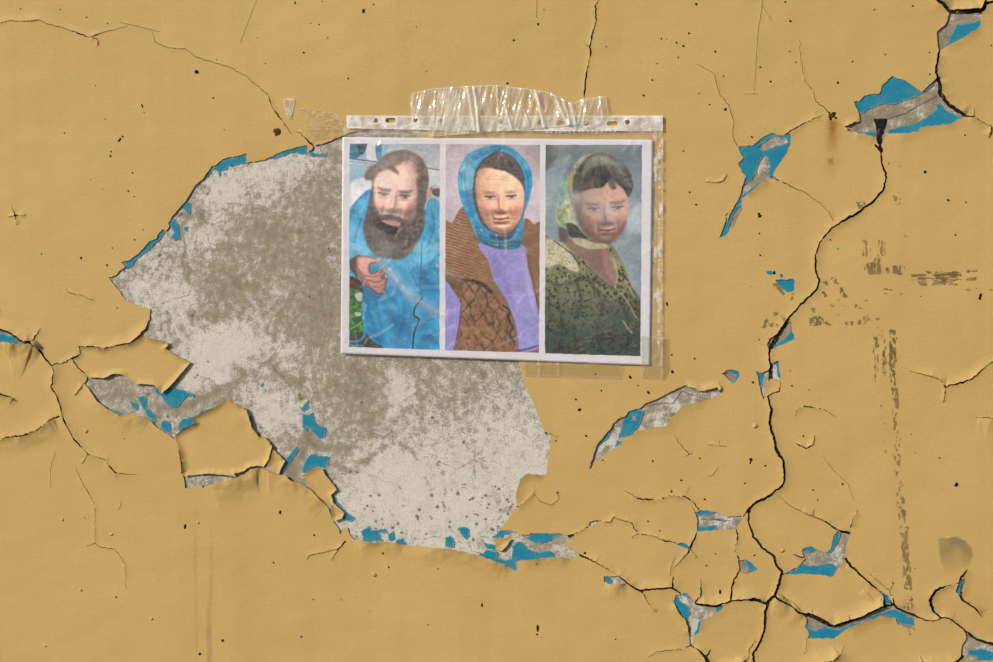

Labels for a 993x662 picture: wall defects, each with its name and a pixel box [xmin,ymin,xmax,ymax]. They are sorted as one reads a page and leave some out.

crack [1,20,313,146]
crack [583,0,599,101]
crack [785,40,830,136]
peeling [845,76,963,143]
crack [935,52,992,137]
crack [936,0,993,14]
peeling [719,133,791,238]
crack [0,328,137,586]
peeling [73,127,580,571]
peeling [590,385,720,469]
peeling [722,370,739,384]
crack [568,118,993,662]